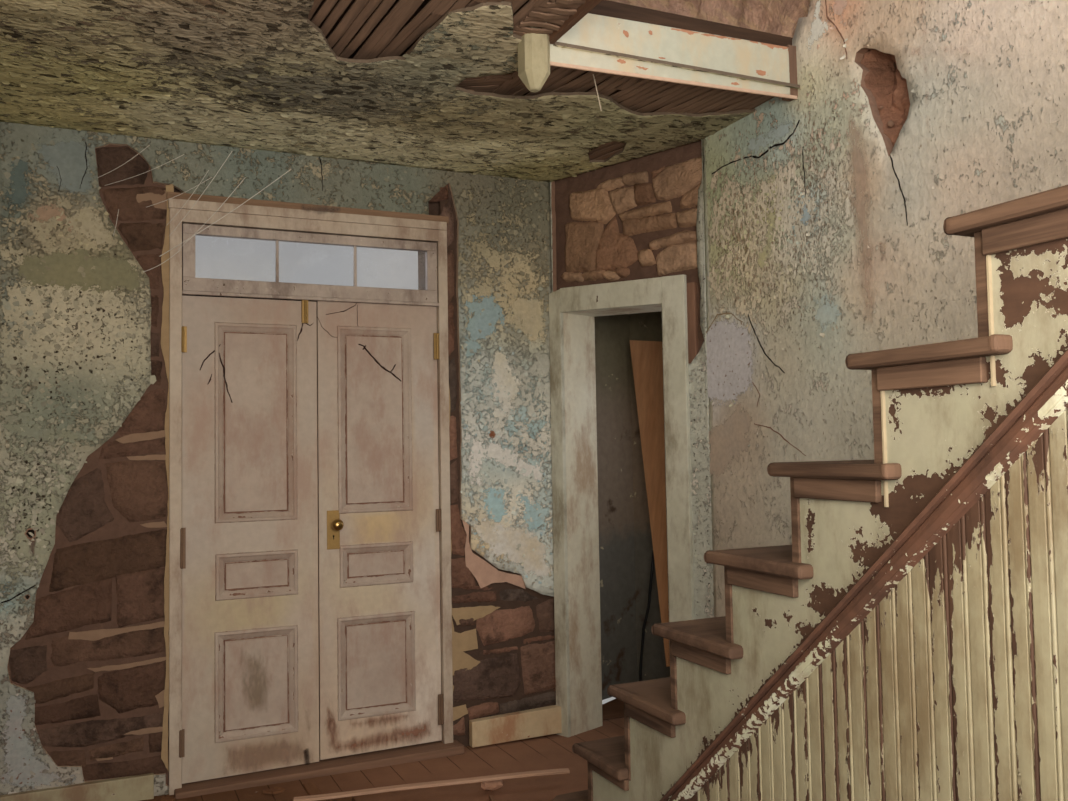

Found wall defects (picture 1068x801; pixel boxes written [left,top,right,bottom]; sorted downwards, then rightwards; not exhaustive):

flaking render [859,0,924,147]
crack [703,120,806,195]
crack [890,155,908,226]
crack [706,313,785,373]
crack [752,382,806,456]